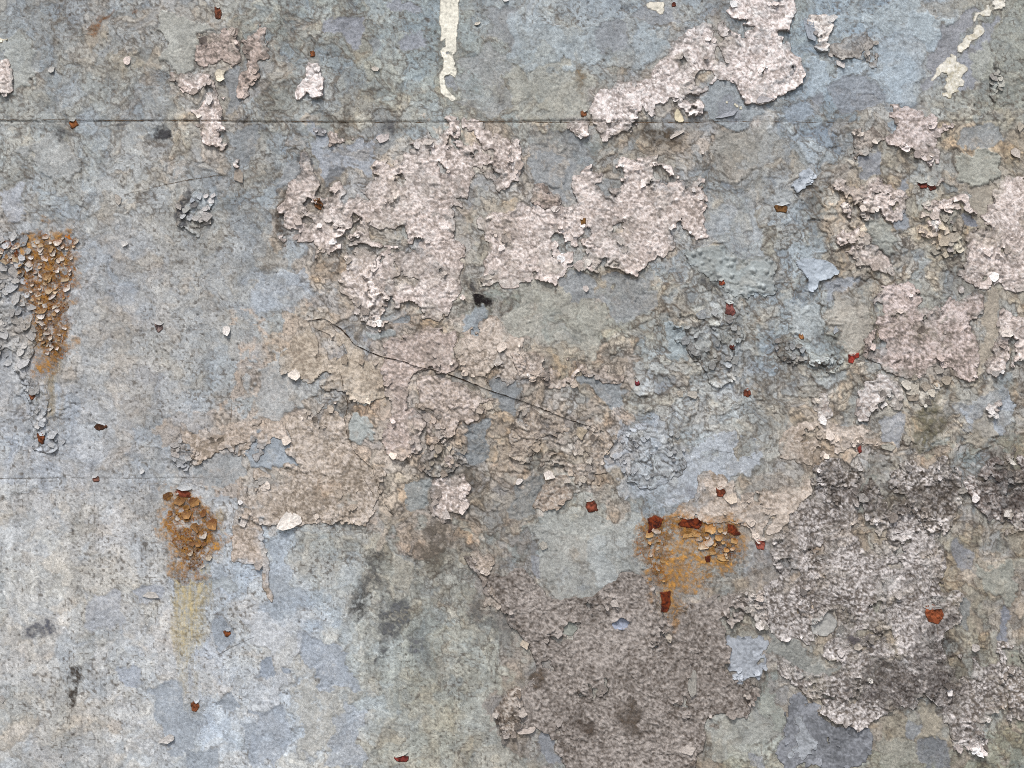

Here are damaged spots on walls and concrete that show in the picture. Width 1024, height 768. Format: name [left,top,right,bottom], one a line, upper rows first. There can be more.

peeling [168,24,270,152]
peeling [567,0,879,142]
peeling [849,104,954,167]
peeling [476,154,709,289]
peeling [0,231,65,454]
corrosion [0,231,79,374]
peeling [169,115,625,602]
crack [307,318,593,513]
peeling [463,175,1024,768]
corrosion [160,485,220,645]
corrosion [637,510,766,613]